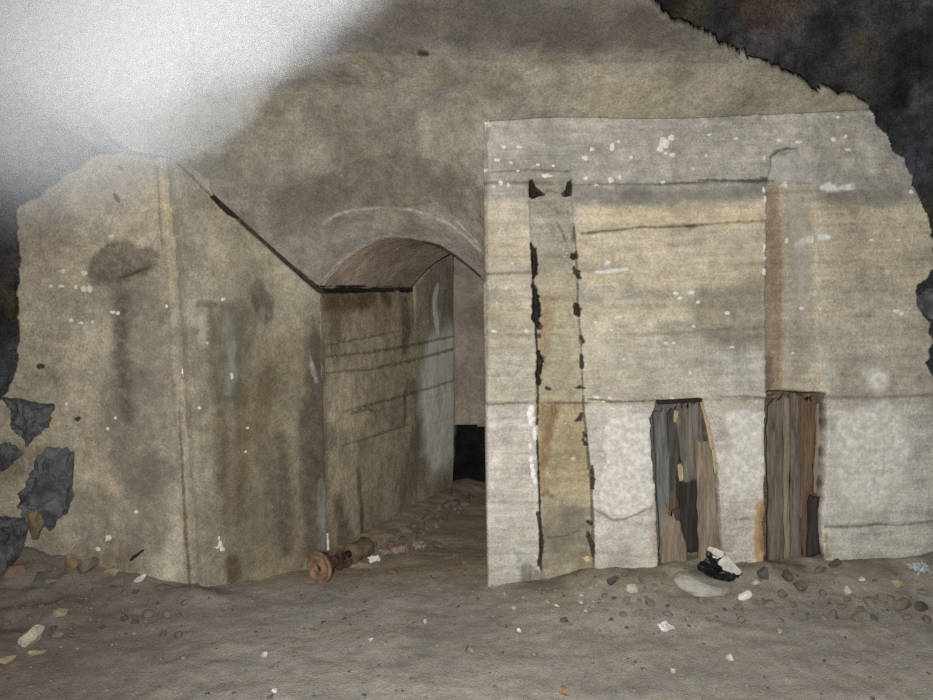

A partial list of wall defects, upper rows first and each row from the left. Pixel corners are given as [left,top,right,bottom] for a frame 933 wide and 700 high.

crack [530,243,551,570]
crack [570,232,611,563]